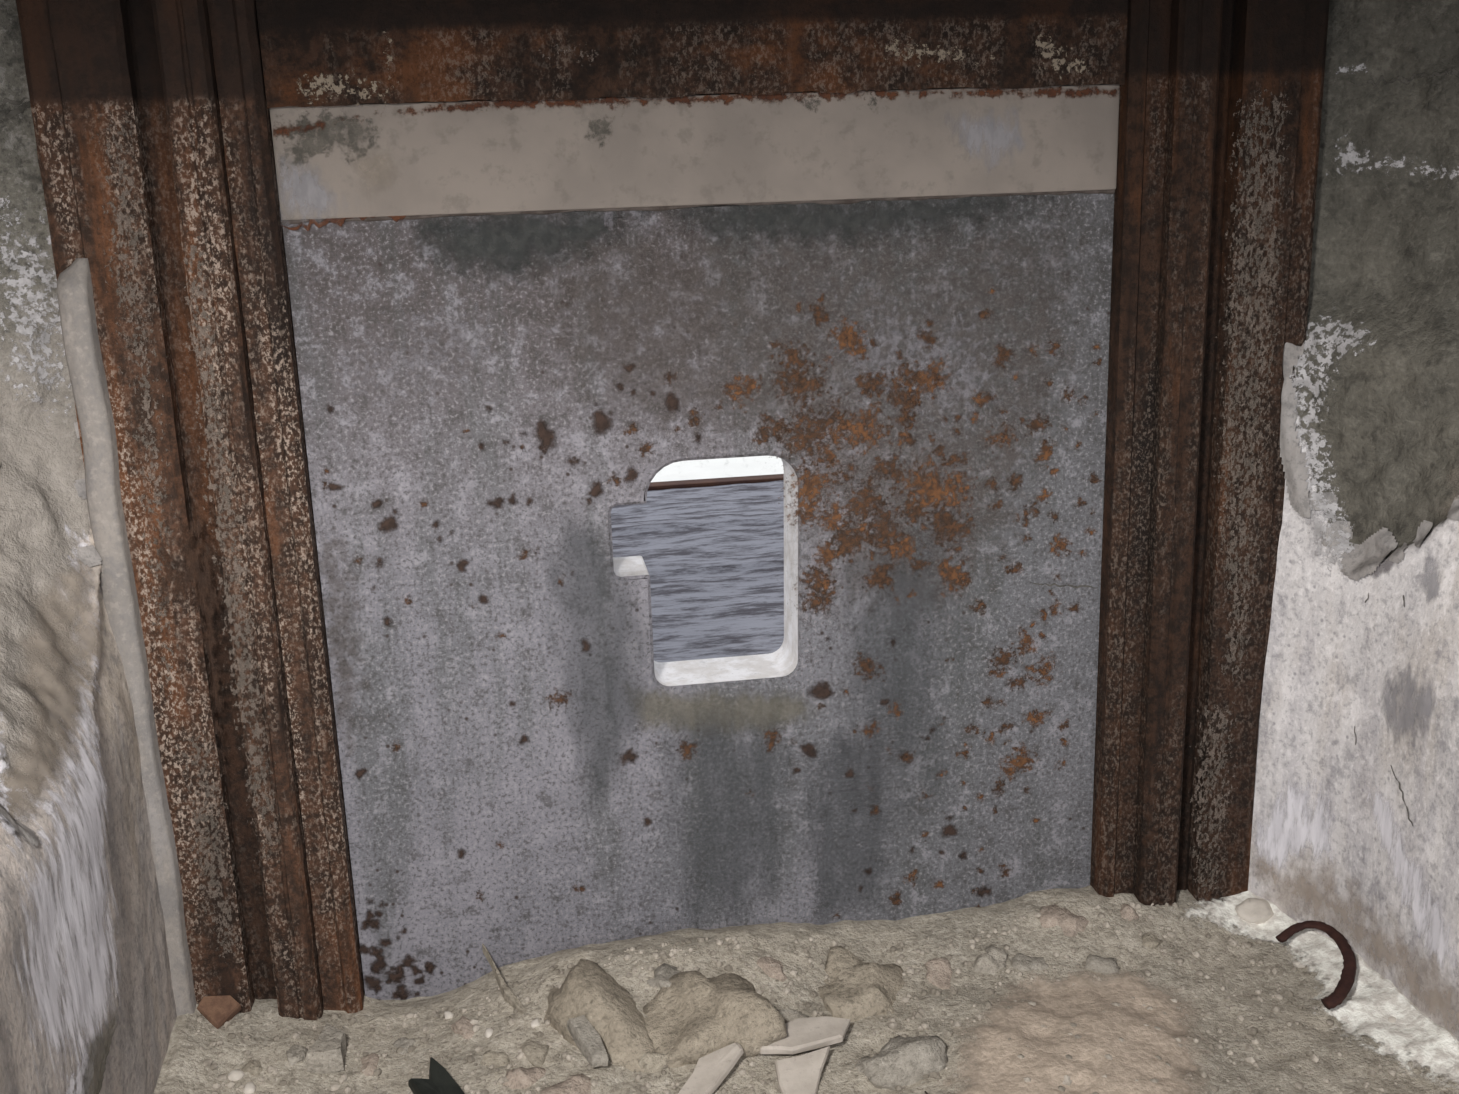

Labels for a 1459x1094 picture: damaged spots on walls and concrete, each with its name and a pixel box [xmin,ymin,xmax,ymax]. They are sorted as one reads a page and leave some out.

rust [398,86,1120,116]
spalling [1215,0,1459,680]
spalling [0,0,102,846]
rust [372,499,398,532]
rust [504,421,555,453]
rust [587,411,654,504]
rust [617,293,1098,620]
rust [809,652,885,710]
rust [982,574,1079,708]
rust [889,709,1069,908]
peeling [1189,702,1238,897]
rust [197,995,241,1029]